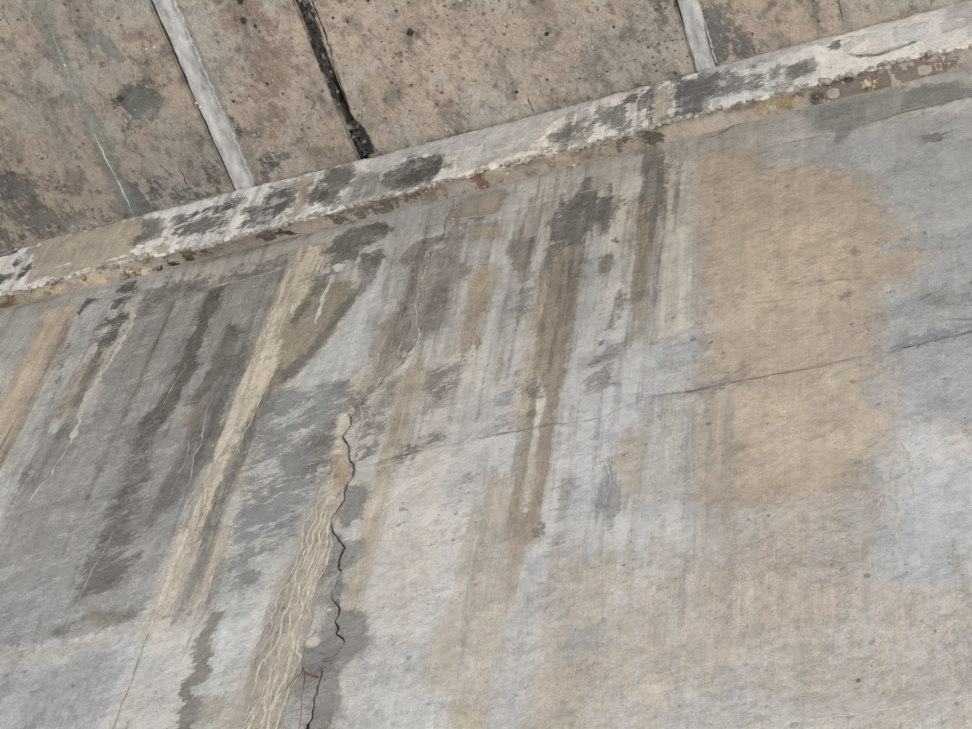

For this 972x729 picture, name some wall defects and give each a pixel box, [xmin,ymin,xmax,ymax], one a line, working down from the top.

leakage [0,0,506,729]
crack [306,203,454,729]
leakage [486,4,972,540]